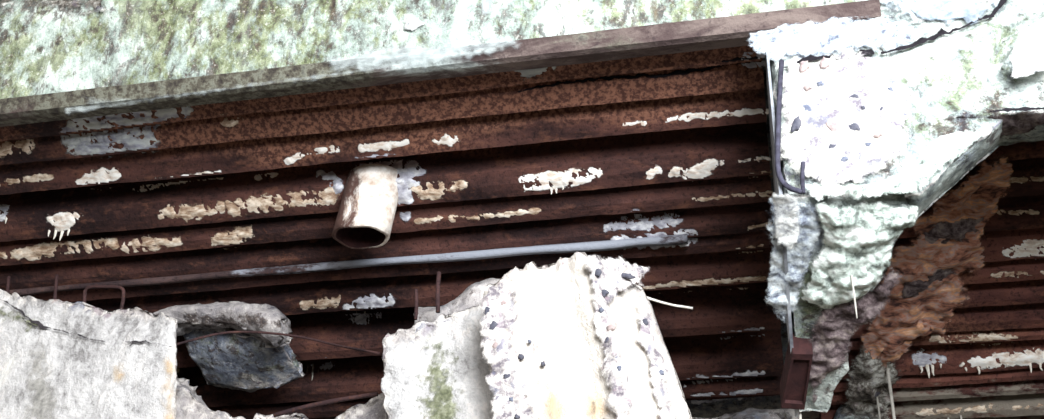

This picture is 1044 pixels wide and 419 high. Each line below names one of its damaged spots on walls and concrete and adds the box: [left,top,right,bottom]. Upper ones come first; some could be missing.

crack [784,0,1007,68]
water stain [75,167,121,189]
water stain [60,106,193,155]
water stain [254,145,340,181]
water stain [667,108,769,122]
spalling [749,0,1001,419]
corrosion [943,107,1044,138]
corrosion [861,157,1014,367]
crack [4,301,174,348]
spalling [479,281,537,419]
spalling [584,255,649,419]
spalling [636,302,677,419]